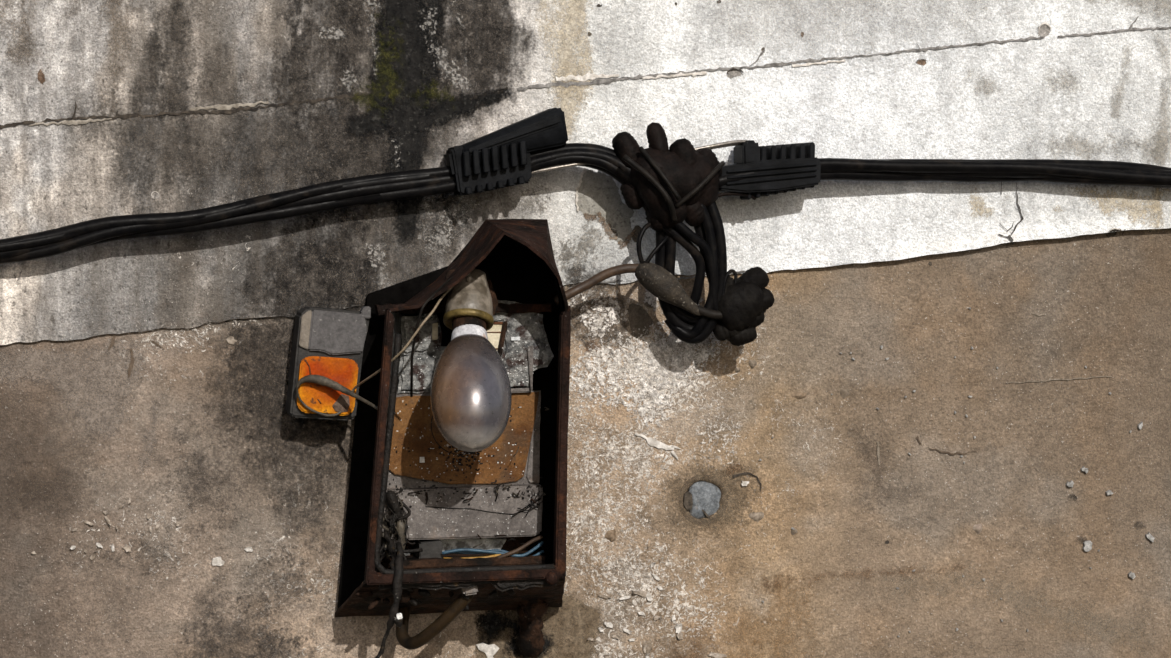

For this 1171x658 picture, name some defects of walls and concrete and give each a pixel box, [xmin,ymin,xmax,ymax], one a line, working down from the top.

water stain [0,0,34,62]
crack [470,16,1171,108]
crack [0,92,393,129]
water stain [89,0,594,213]
crack [998,182,1024,244]